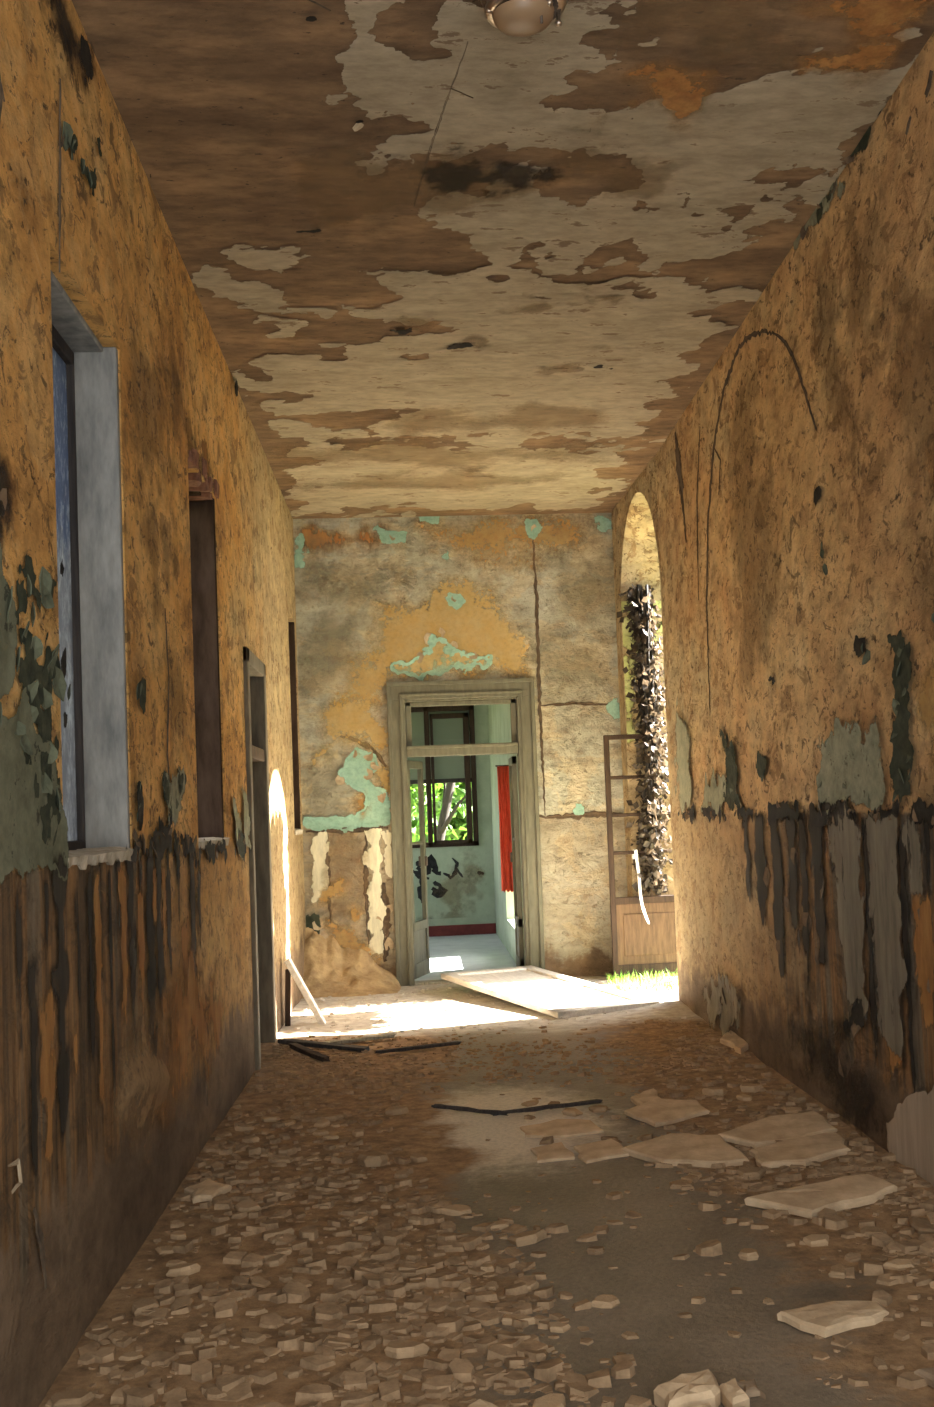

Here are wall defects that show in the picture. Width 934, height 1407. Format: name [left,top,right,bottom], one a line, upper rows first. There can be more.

crack [0,75,8,119]
peeling [188,0,923,569]
crack [674,329,817,715]
peeling [0,543,71,884]
leakage [16,846,201,1177]
spalling [131,765,251,868]
peeling [303,578,529,962]
peeling [573,804,584,815]
peeling [606,698,620,720]
peeling [674,630,934,1137]